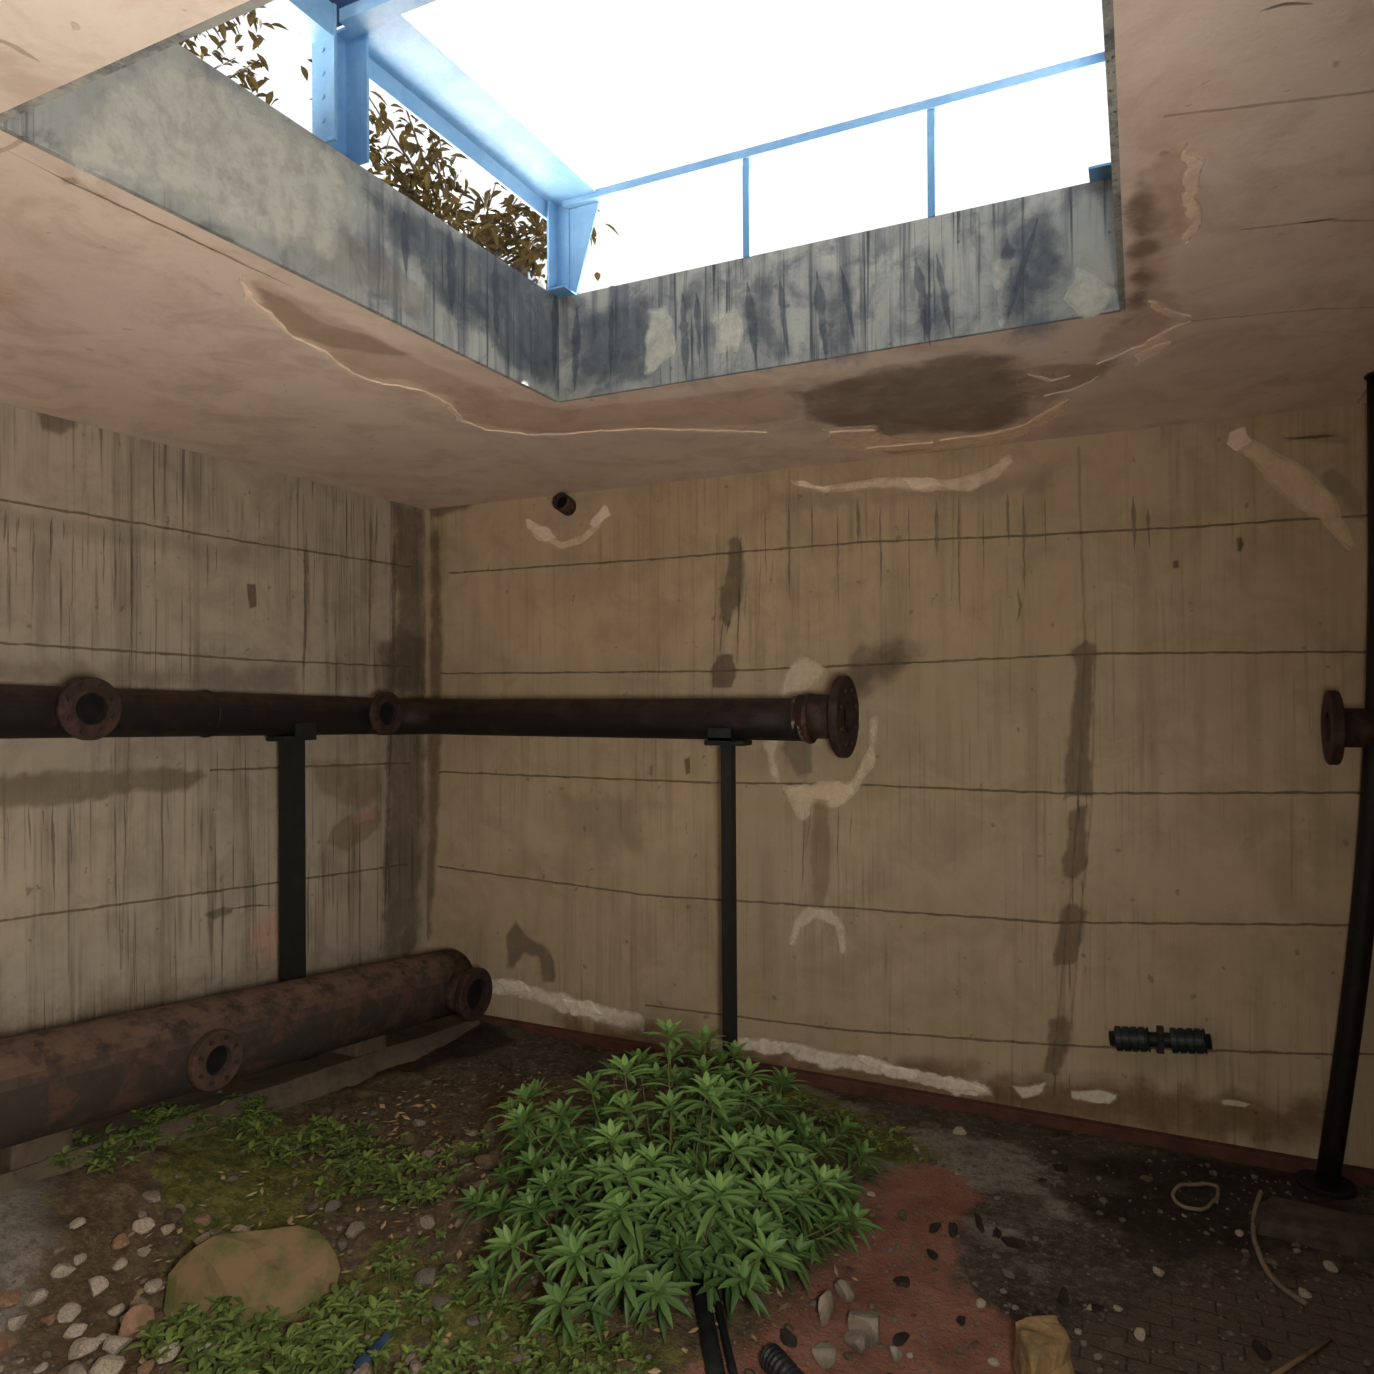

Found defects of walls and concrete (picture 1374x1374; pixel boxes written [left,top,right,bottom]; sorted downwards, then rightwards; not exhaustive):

spalling [1181,144,1203,245]
flaking render [1067,273,1110,316]
flaking render [1228,427,1353,547]
water stain [0,769,200,806]
efflorescence [711,1038,988,1096]